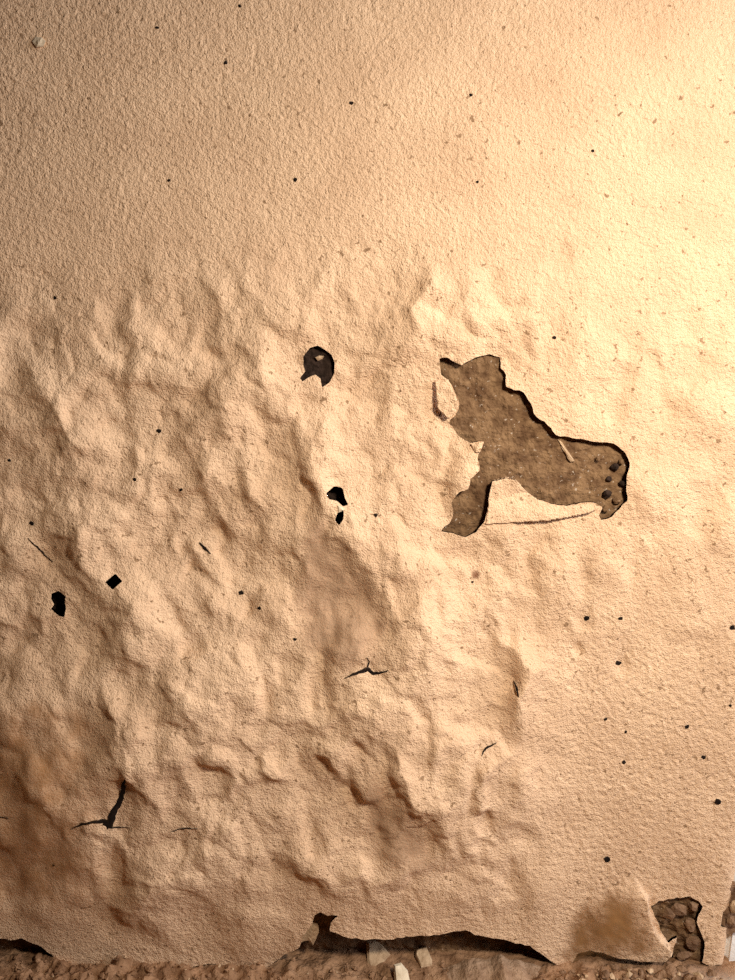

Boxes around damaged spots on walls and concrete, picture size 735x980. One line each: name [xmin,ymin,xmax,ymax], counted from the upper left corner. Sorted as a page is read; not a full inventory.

spalling [435,354,629,536]
crack [71,778,129,830]
peeling [298,912,534,980]
spalling [651,896,704,961]
spalling [721,881,735,934]